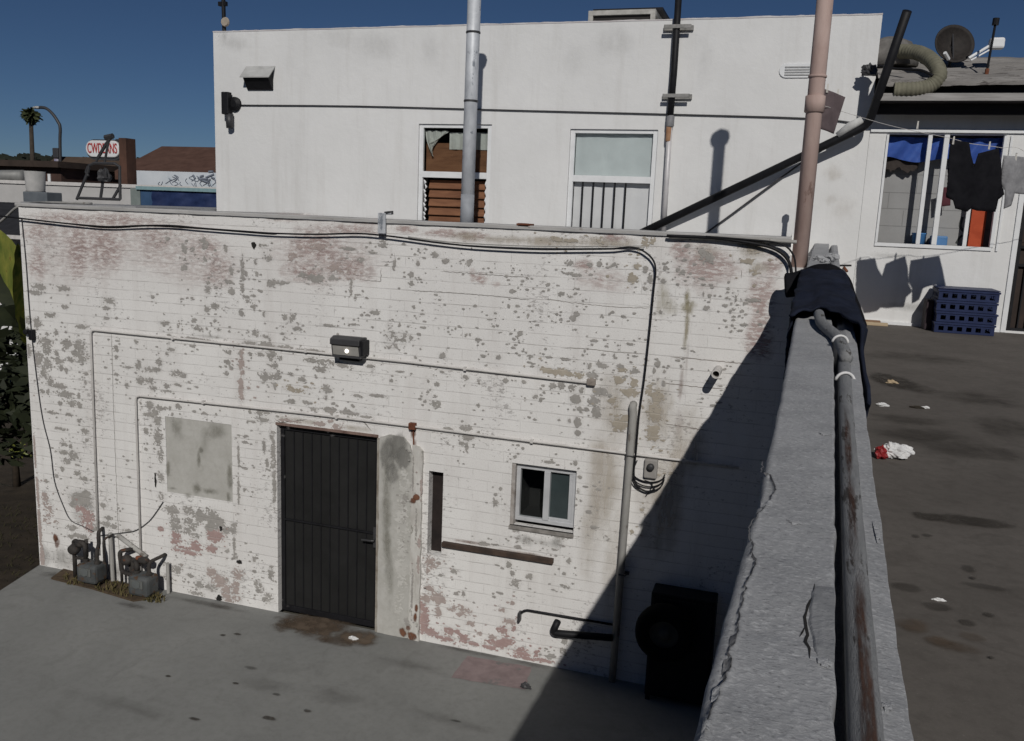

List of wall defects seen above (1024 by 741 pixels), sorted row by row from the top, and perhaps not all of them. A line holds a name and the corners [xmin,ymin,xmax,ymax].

water stain [683,293,692,340]
water stain [381,435,410,480]
peeling [26,232,782,604]
rust [399,605,418,640]
peeling [384,449,576,666]
crack [707,461,776,719]
crack [799,584,815,658]
rust [856,588,877,741]